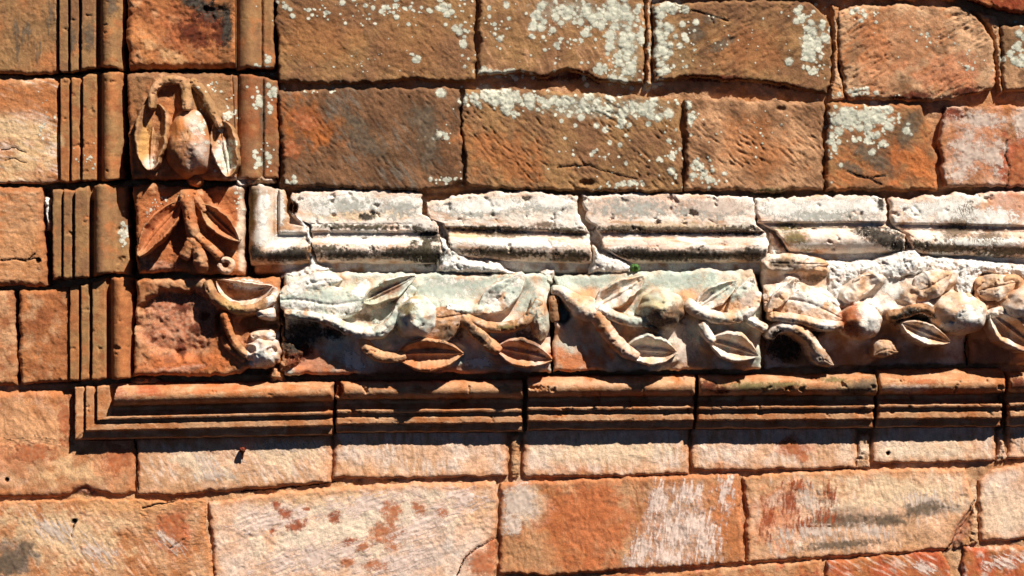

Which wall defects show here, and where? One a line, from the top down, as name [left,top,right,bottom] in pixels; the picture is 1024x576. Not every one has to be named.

crack [944,499,975,551]
crack [456,537,498,576]